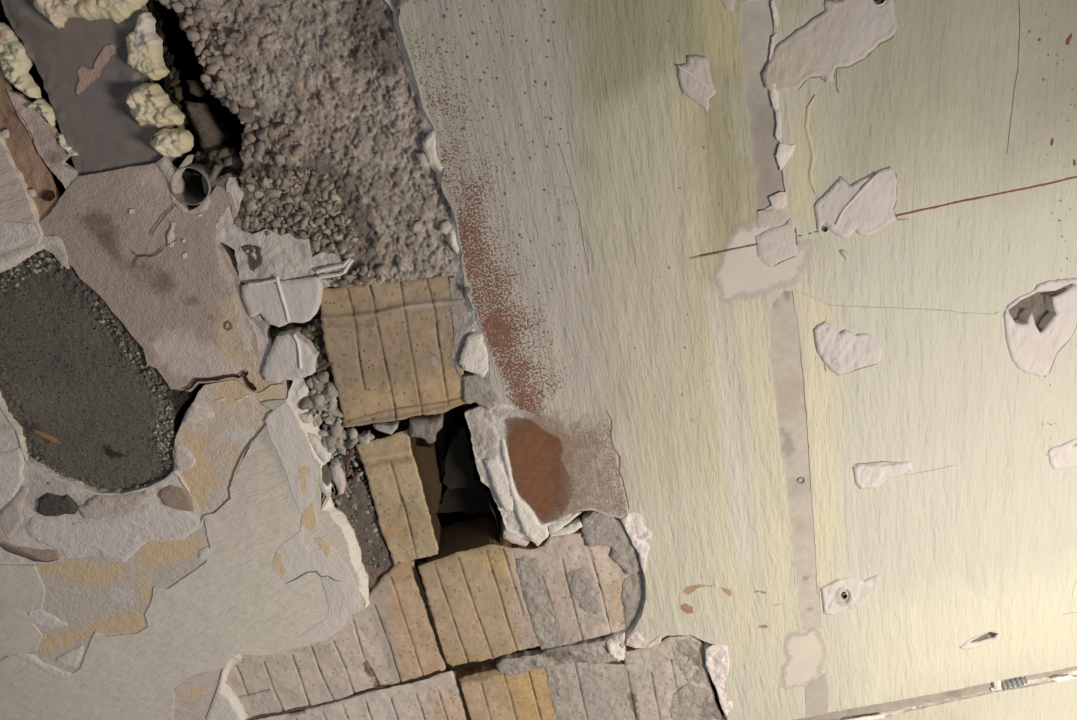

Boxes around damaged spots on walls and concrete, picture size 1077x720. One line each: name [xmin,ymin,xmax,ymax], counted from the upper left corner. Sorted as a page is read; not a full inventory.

spalling [148,0,583,546]
corrosion [405,0,626,523]
hole [1008,287,1067,332]
peeling [607,412,630,510]
flaking render [0,378,370,679]
peeling [173,654,247,720]
spalling [838,704,932,720]
spalling [981,669,1077,697]